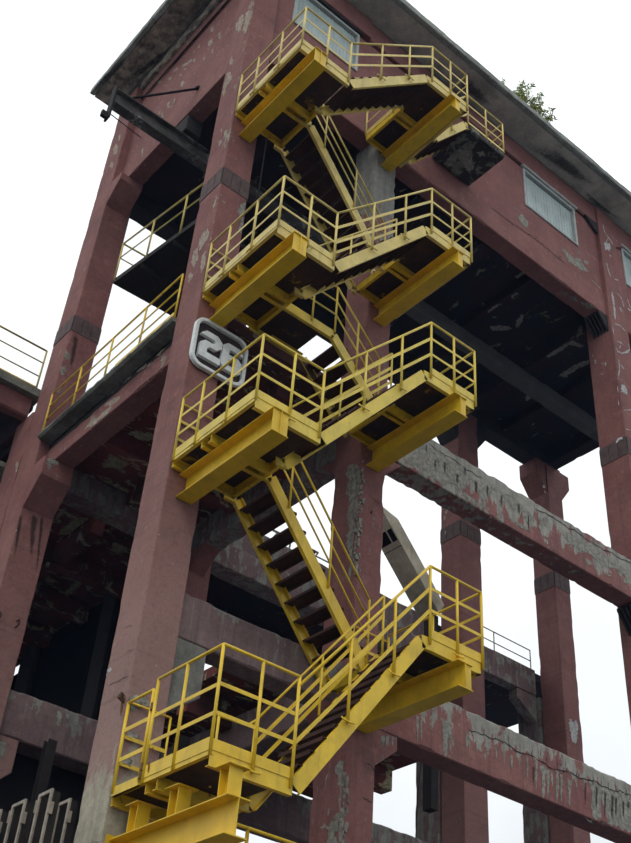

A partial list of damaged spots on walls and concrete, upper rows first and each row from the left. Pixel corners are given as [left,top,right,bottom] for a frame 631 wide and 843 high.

peeling [235,4,252,34]
peeling [222,57,234,96]
peeling [405,447,548,532]
spalling [317,761,350,843]
peeling [495,746,577,806]
crack [469,729,631,796]
peeling [587,781,631,832]